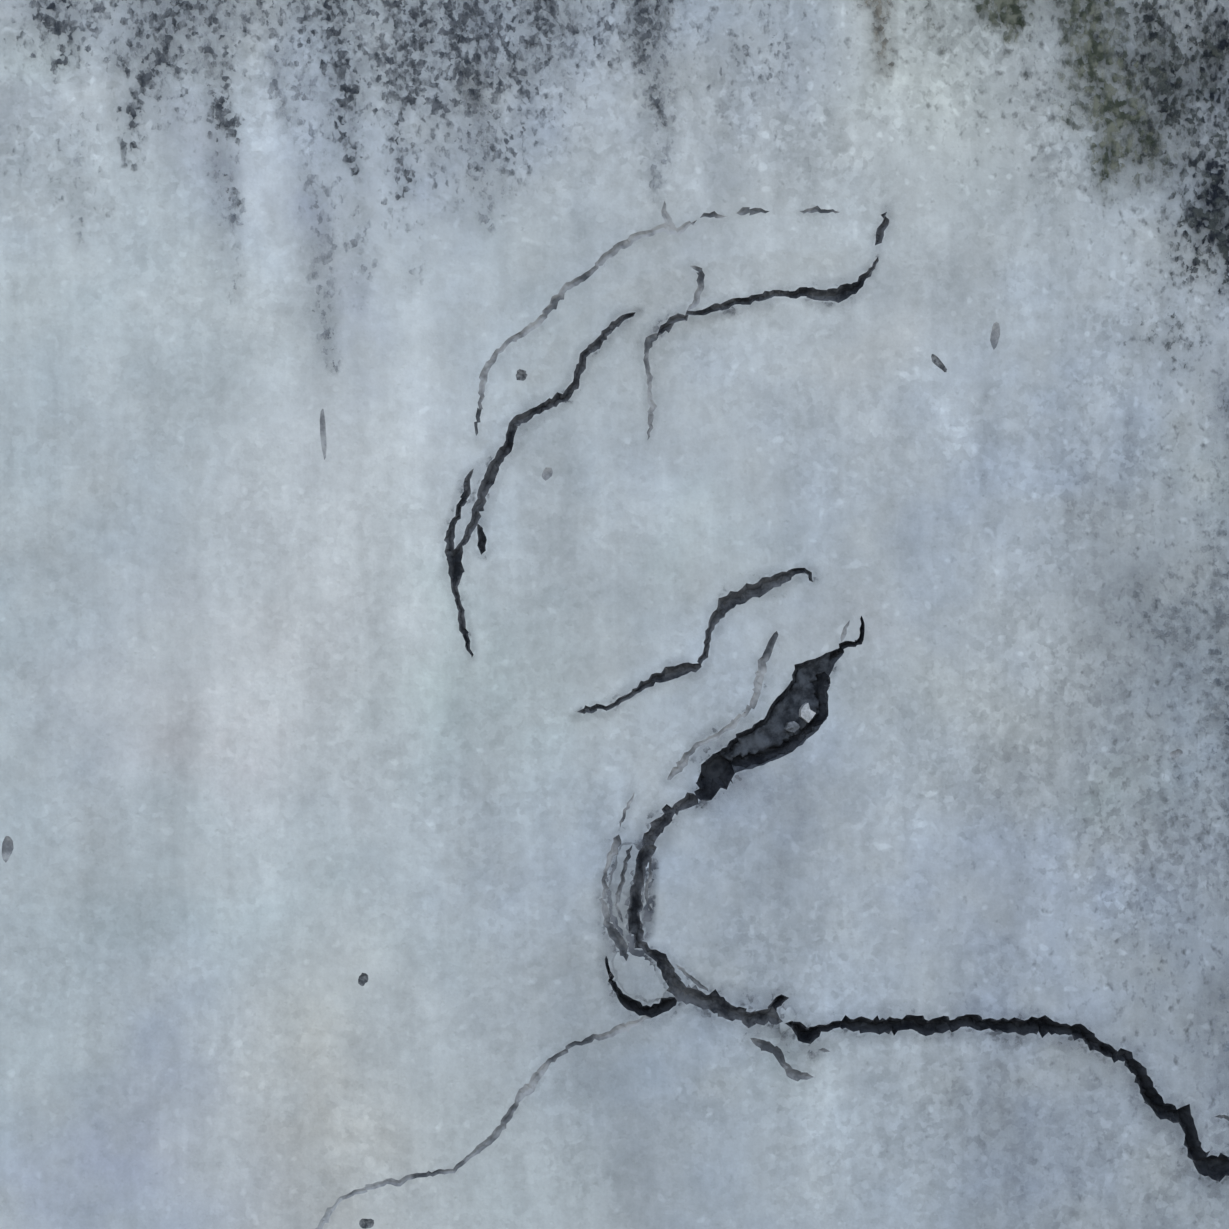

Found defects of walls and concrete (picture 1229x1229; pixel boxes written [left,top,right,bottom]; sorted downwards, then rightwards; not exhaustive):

damp [32,0,673,204]
damp [1080,0,1229,294]
crack [444,201,889,657]
crack [577,568,815,714]
damp [1129,562,1229,786]
crack [315,631,1229,1229]